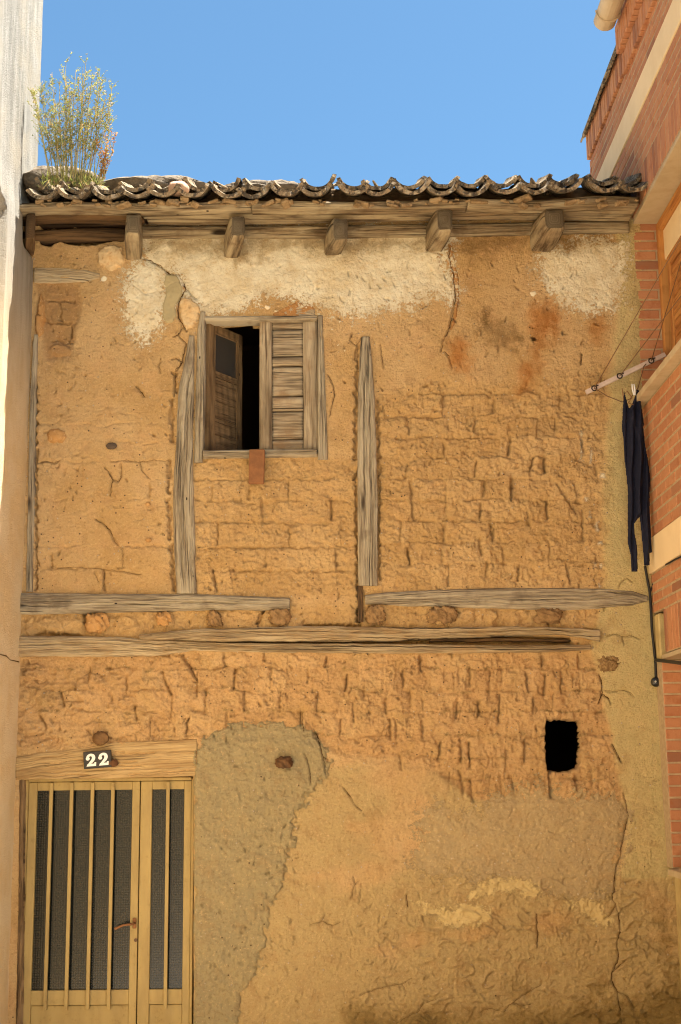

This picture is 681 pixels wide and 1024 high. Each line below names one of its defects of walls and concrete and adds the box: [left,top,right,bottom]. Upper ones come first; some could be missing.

peeling [101,237,468,355]
crack [441,248,456,366]
crack [52,521,140,589]
crack [608,795,631,1024]